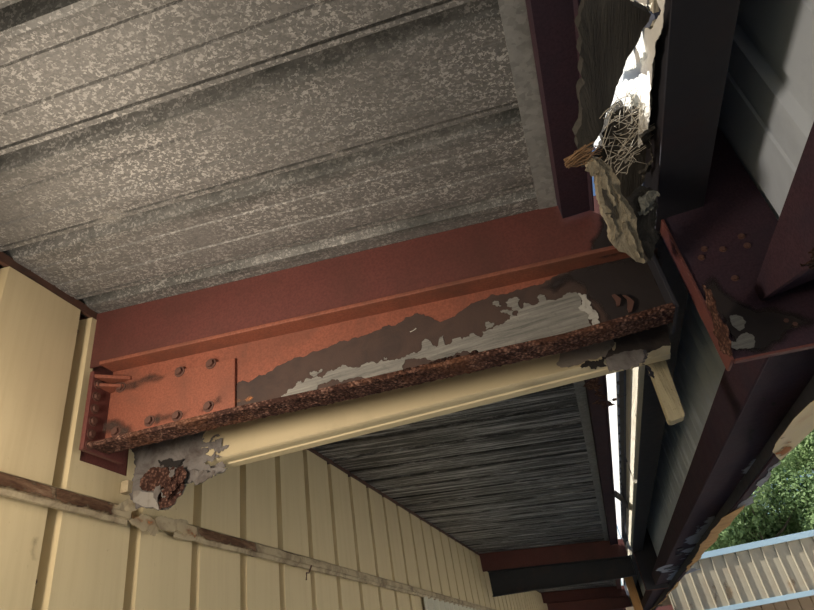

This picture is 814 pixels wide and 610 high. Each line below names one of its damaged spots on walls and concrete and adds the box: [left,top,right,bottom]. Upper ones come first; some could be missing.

peeling [236,272,608,406]
rust [556,324,670,378]
peeling [730,315,755,350]
rust [583,377,627,409]
rust [153,465,187,502]
peeling [734,462,781,511]
peeling [655,516,715,580]